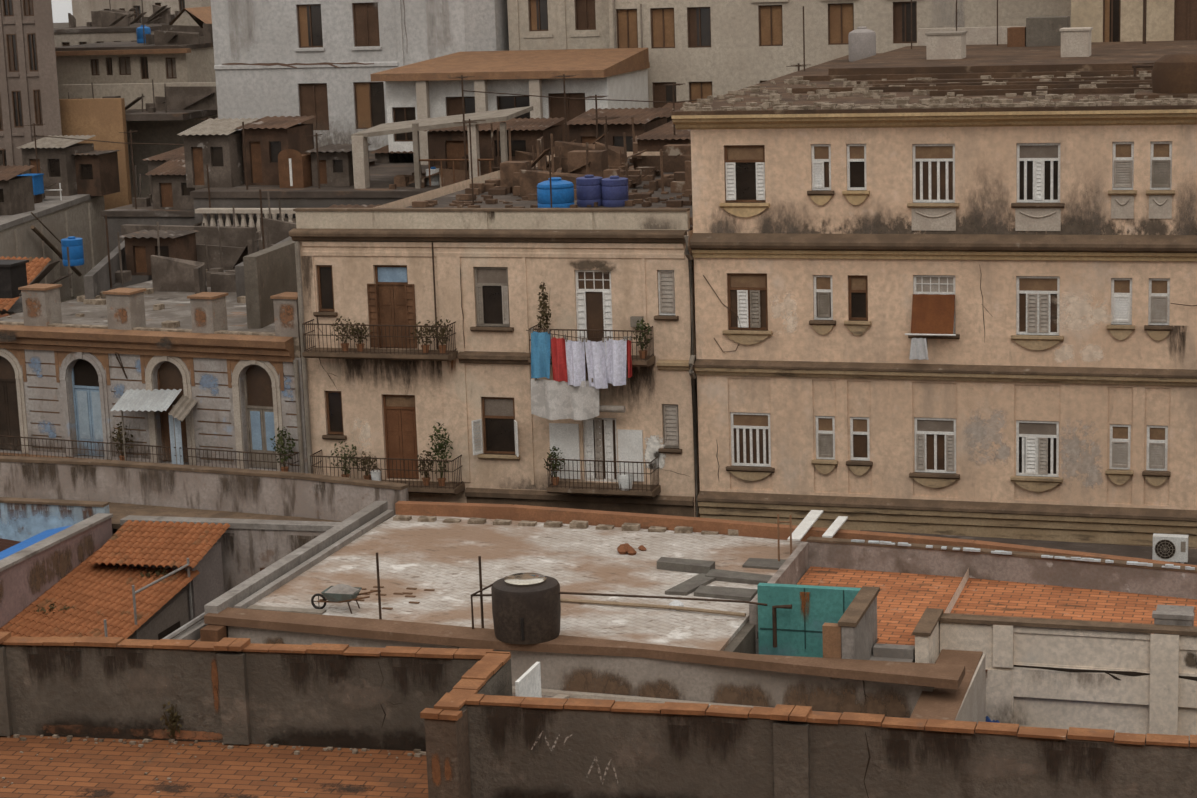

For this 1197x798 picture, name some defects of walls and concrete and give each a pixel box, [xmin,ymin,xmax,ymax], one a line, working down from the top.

leakage [763,201,1197,235]
leakage [23,645,80,678]
leakage [98,647,144,672]
leakage [266,638,354,684]
leakage [391,658,446,691]
leakage [562,670,681,700]
crack [1013,665,1150,680]
crack [1179,674,1197,682]
leakage [43,721,195,742]
leakage [1041,739,1108,775]